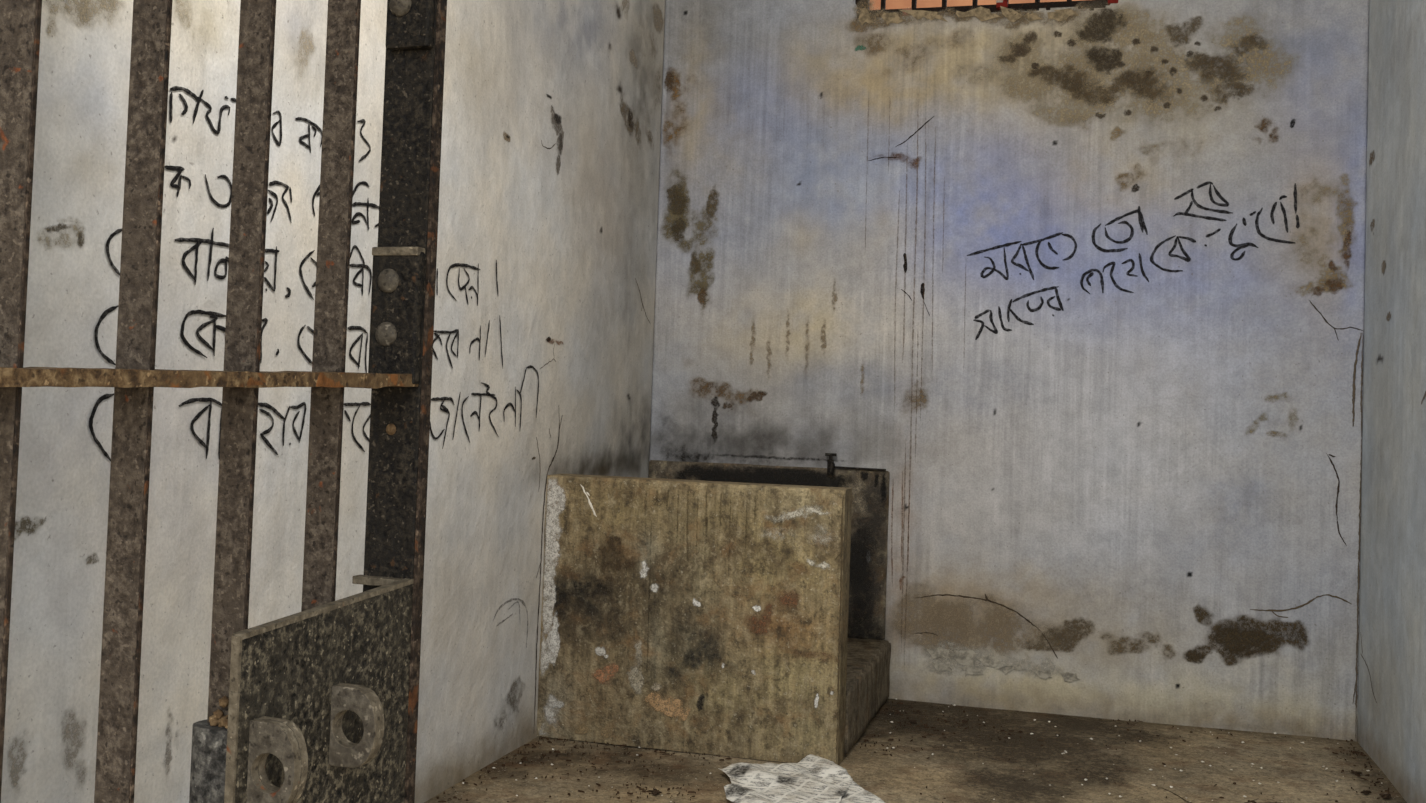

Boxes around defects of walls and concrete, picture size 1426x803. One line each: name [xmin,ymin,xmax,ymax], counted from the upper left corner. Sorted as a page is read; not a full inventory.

leakage [850,14,885,54]
leakage [974,8,1293,139]
leakage [1299,174,1354,295]
leakage [667,111,1308,666]
leakage [551,536,637,616]